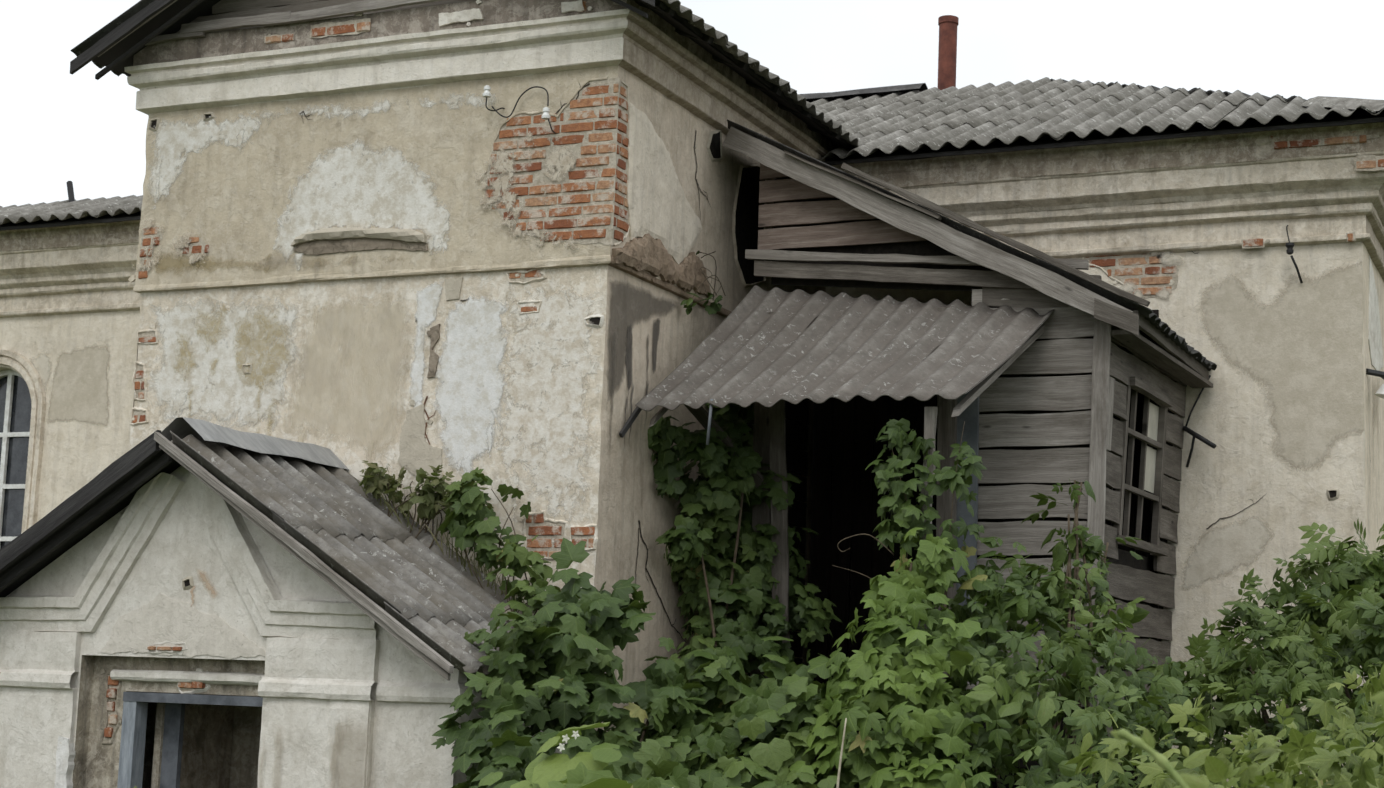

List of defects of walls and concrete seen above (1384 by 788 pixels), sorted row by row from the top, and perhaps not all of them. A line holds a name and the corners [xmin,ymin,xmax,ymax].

flaking render [264,13,371,44]
peeling [148,93,495,203]
flaking render [475,76,711,298]
crack [694,131,710,216]
flaking render [1270,131,1384,171]
flaking render [128,220,211,283]
flaking render [1081,252,1184,299]
flaking render [48,346,110,425]
peeling [130,295,299,431]
peeling [398,269,604,560]
flaking render [100,669,122,745]